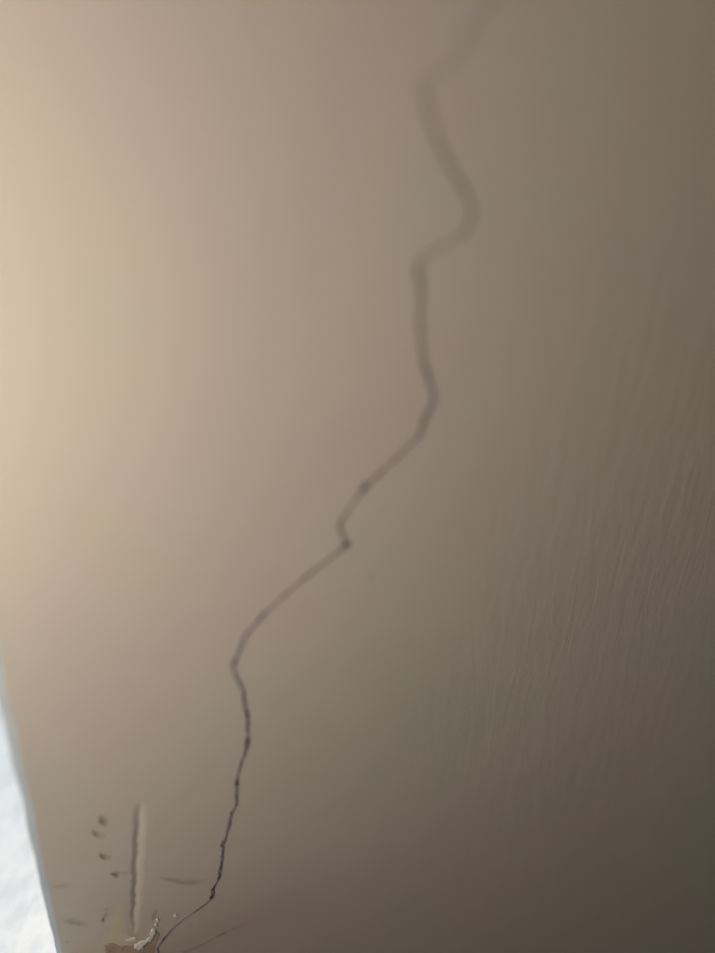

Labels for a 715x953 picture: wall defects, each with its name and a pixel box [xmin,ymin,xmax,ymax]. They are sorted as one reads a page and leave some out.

flaking render [104,907,160,953]
crack [156,0,490,953]